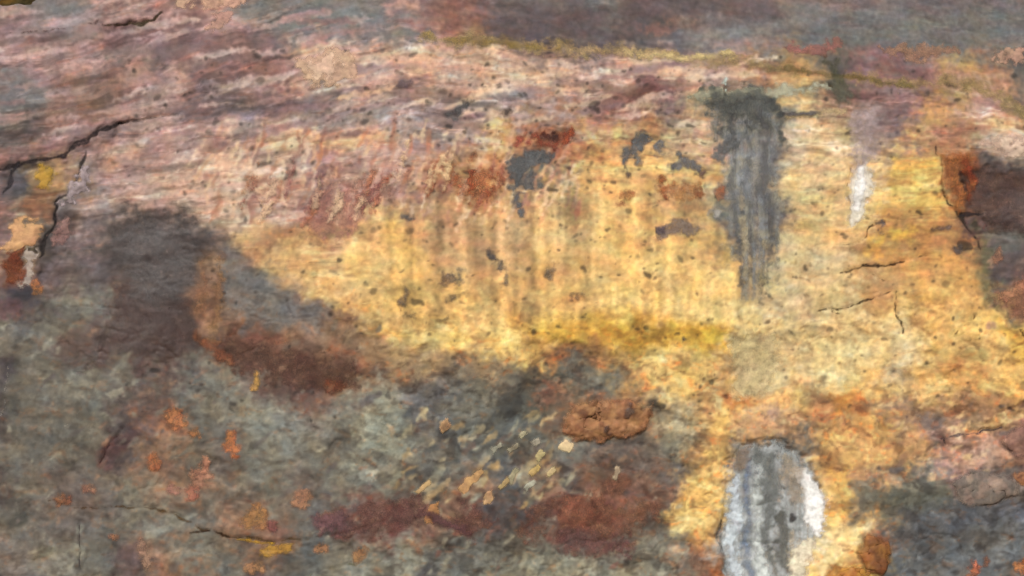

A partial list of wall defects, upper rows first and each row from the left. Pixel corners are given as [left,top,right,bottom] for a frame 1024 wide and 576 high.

crack [0,118,151,257]
rust [515,128,575,150]
water stain [419,31,1024,303]
rust [944,153,978,208]
water stain [80,205,211,373]
rust [193,259,357,393]
rust [241,503,277,532]
rust [244,544,292,574]
rust [291,489,498,563]
water stain [720,438,825,576]